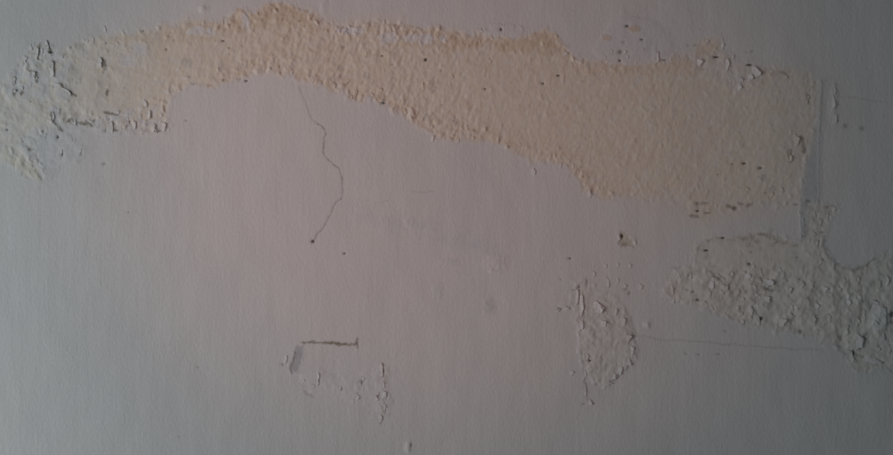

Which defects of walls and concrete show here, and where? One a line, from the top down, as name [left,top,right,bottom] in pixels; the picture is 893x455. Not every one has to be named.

peeling [0,40,174,138]
peeling [830,249,893,375]